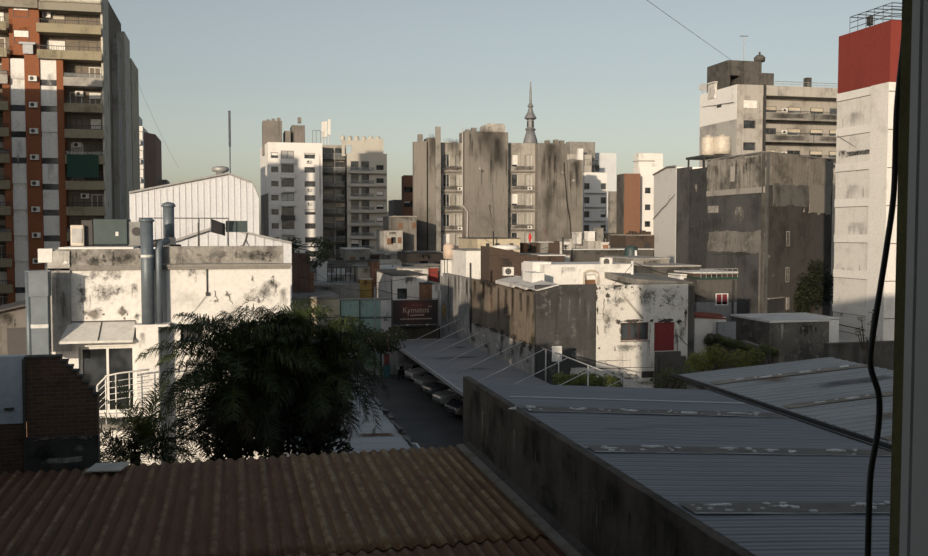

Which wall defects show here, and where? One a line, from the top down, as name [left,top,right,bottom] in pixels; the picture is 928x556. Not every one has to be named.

peeling [594,284,687,339]